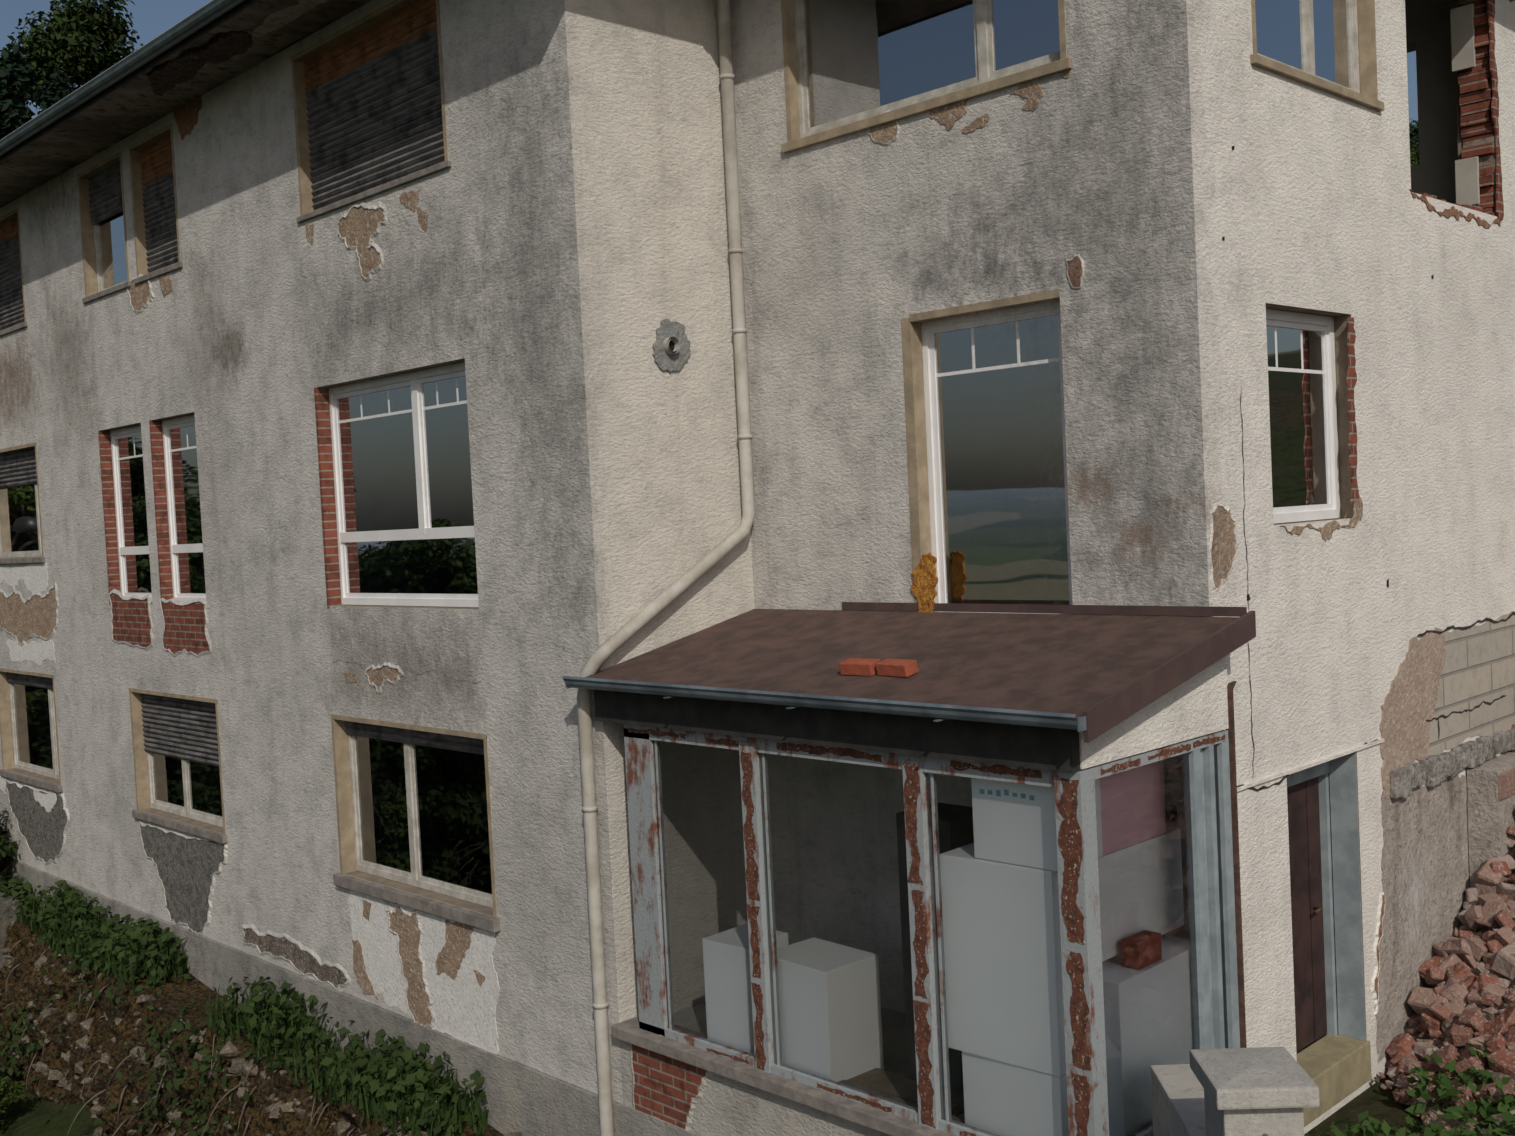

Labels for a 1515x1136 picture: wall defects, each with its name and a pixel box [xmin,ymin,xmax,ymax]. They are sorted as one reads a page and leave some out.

flaking render [1409,0,1515,228]
flaking render [0,777,70,865]
flaking render [139,820,228,936]
flaking render [362,898,485,1030]
corrosion [706,737,766,1071]
corrosion [776,742,882,763]
corrosion [903,763,936,1128]
corrosion [1056,778,1091,1136]
corrosion [1101,734,1225,776]
crack [1237,644,1289,791]
spalling [1371,611,1515,1136]
flaking render [630,1035,711,1131]